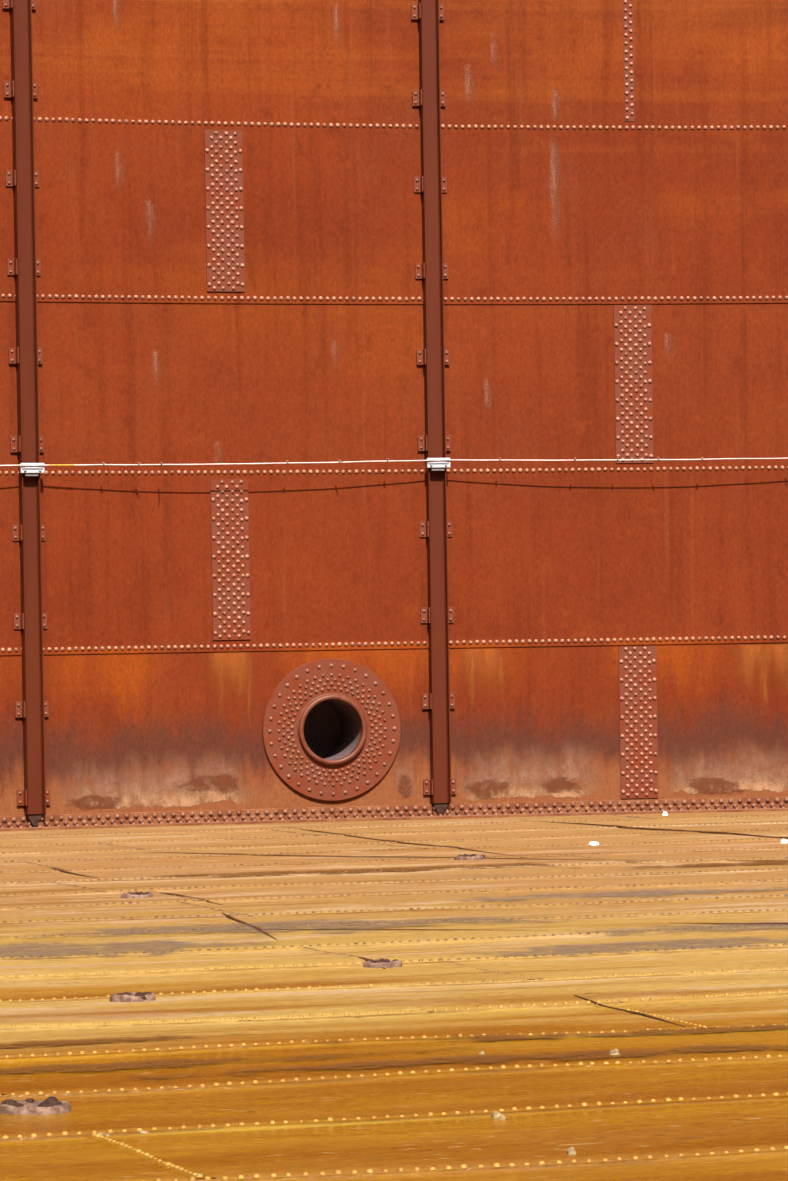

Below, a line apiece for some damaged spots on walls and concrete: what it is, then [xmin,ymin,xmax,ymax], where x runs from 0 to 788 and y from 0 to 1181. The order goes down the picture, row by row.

rust [212,653,250,700]
rust [741,644,788,696]
water stain [72,766,239,809]
water stain [466,752,589,800]
water stain [677,757,788,794]